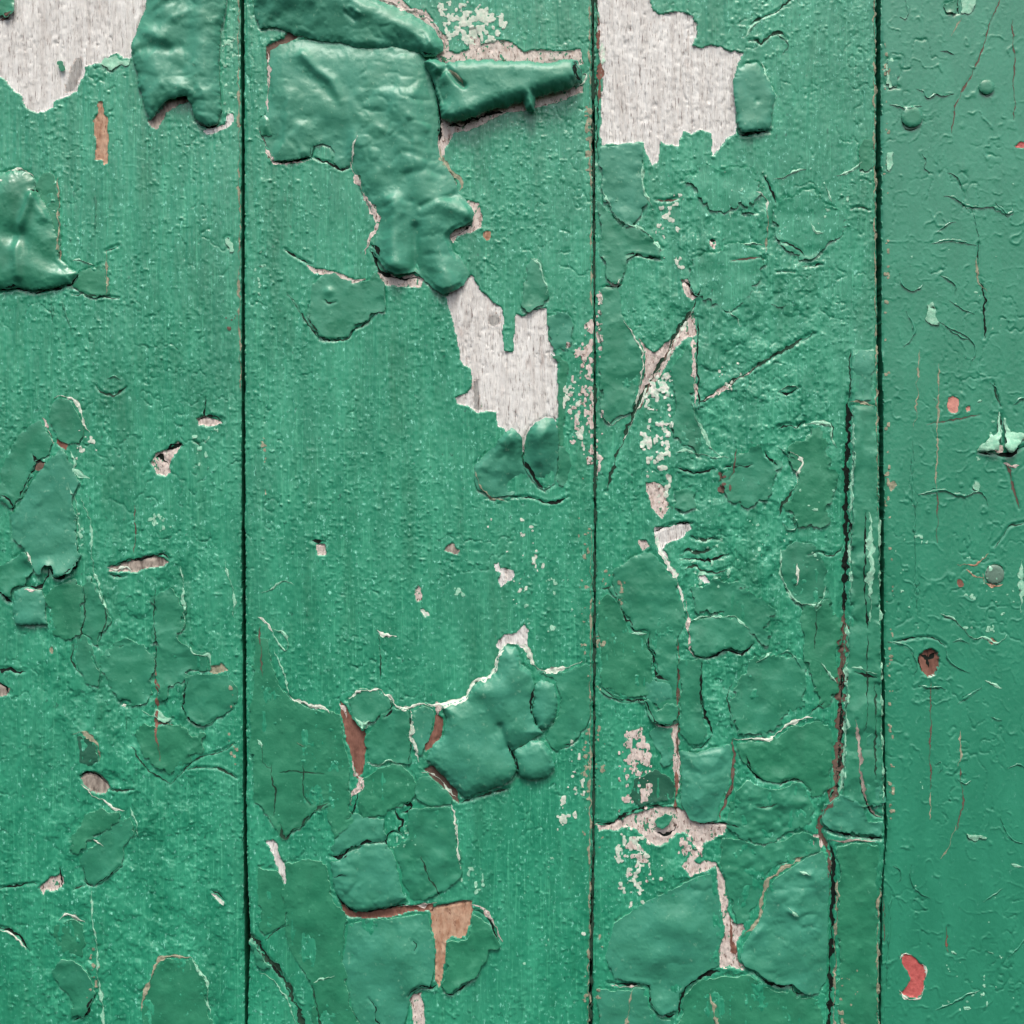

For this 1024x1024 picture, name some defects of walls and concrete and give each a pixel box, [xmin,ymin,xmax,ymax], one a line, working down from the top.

peeling [0,0,146,113]
peeling [597,0,775,456]
crack [156,401,224,464]
peeling [446,258,571,486]
peeling [850,350,875,401]
crack [927,384,1024,574]
crack [0,558,107,671]
crack [333,801,413,912]
peeling [249,635,500,1024]
peeling [539,482,886,1024]
crack [597,354,882,1024]
crack [249,924,321,1024]